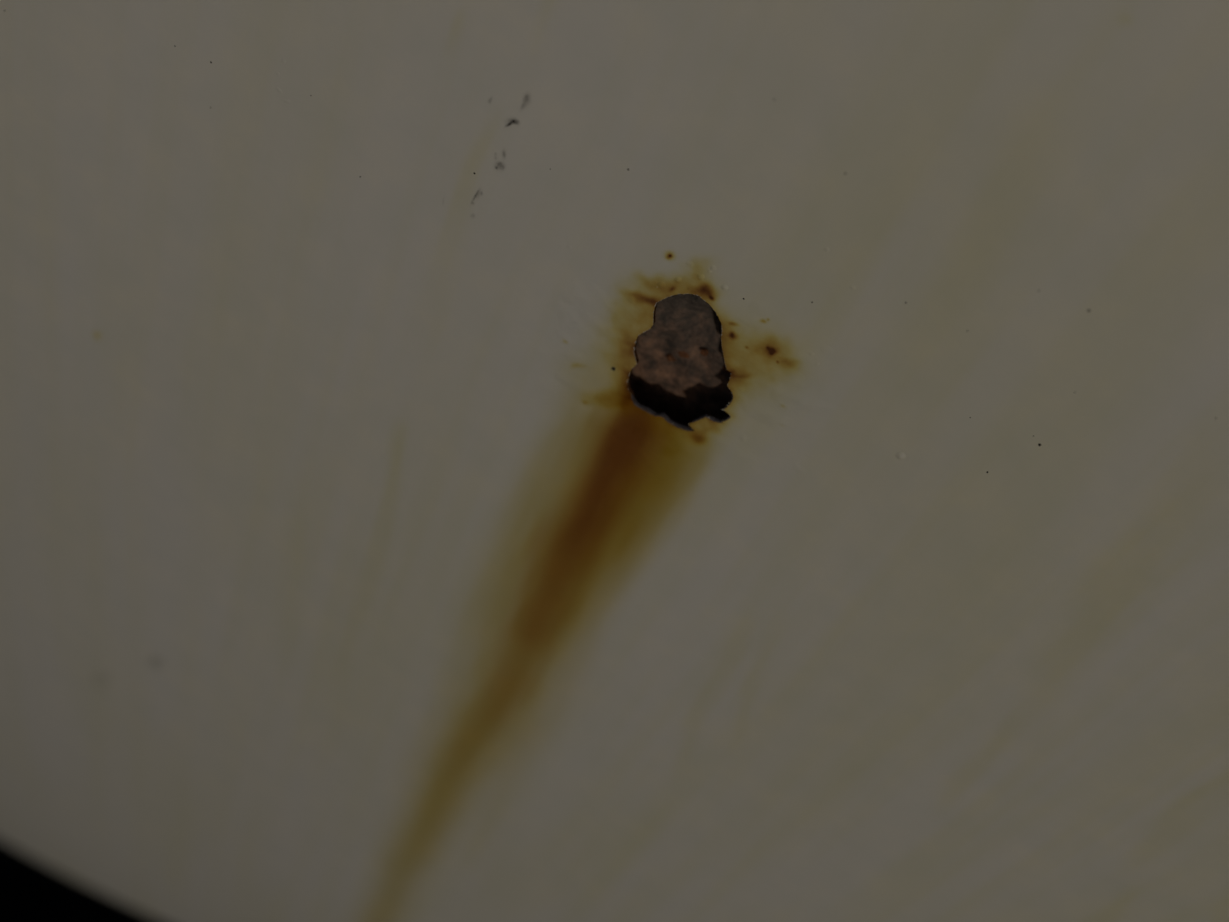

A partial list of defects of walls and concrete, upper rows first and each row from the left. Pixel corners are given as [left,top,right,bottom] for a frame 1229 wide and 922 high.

spalling [629,294,732,427]